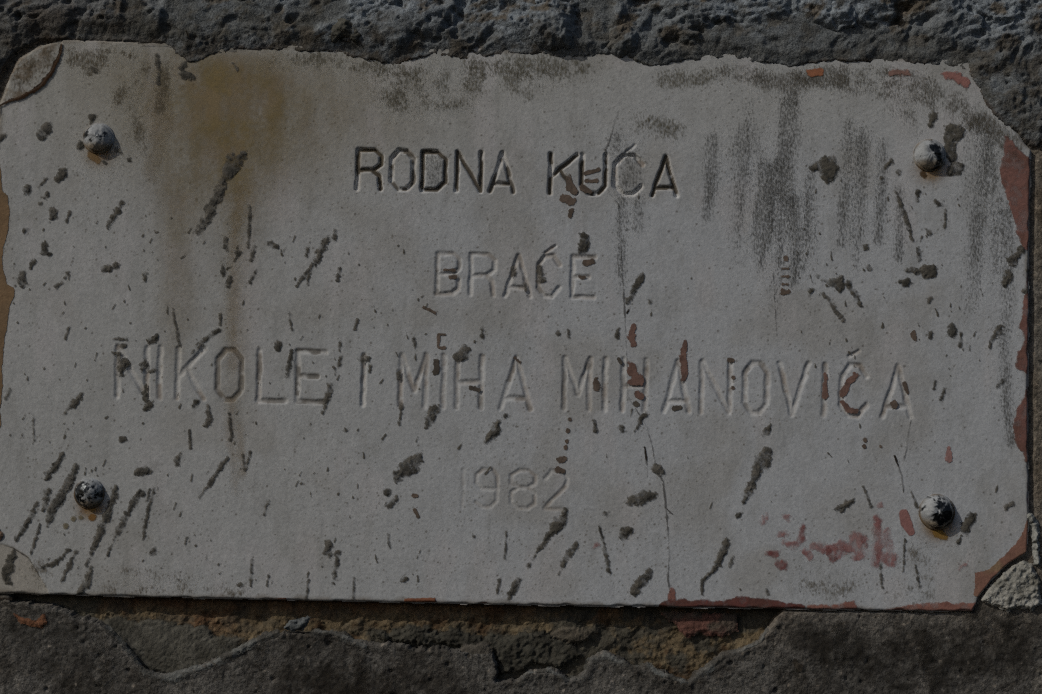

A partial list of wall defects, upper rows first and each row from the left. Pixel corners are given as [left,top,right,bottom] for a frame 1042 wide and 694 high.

spalling [13,588,857,684]